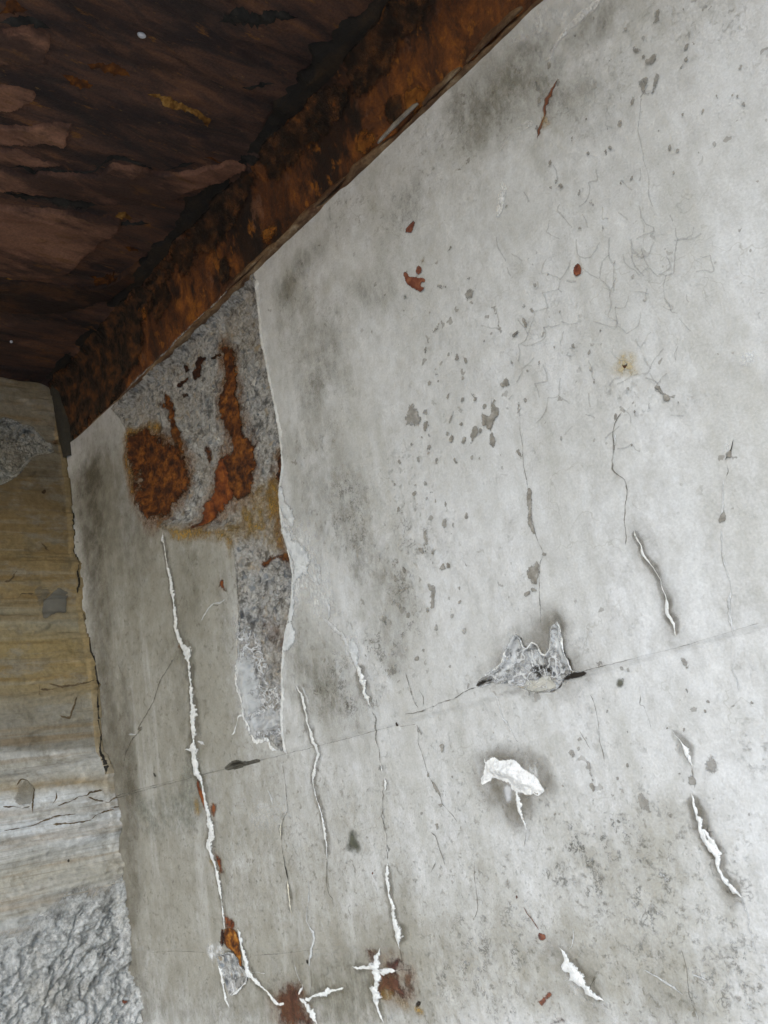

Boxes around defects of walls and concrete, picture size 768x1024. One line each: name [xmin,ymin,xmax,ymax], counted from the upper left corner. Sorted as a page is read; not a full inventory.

rust [377,103,419,144]
rust [537,79,558,137]
rust [403,266,425,292]
spalling [112,274,292,751]
rust [124,340,290,567]
crack [612,415,685,646]
crack [3,505,343,1024]
rust [220,917,242,967]
rust [275,984,312,1024]
crack [302,557,473,960]
crack [559,931,605,1002]
crack [673,732,765,983]